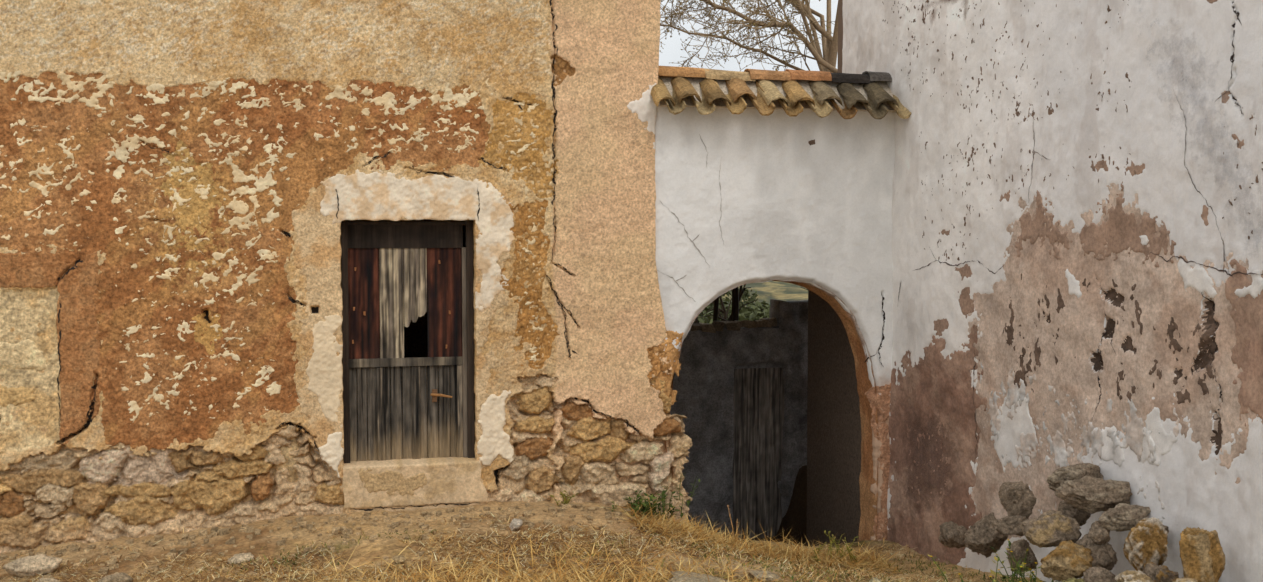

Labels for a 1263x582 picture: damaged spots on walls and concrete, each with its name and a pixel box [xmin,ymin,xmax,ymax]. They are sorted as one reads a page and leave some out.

crack [57,260,98,442]
peeling [0,62,693,554]
crack [504,0,580,358]
flaking render [550,54,575,87]
peeling [864,0,1263,565]
crack [1150,90,1263,419]
crack [1218,2,1244,116]